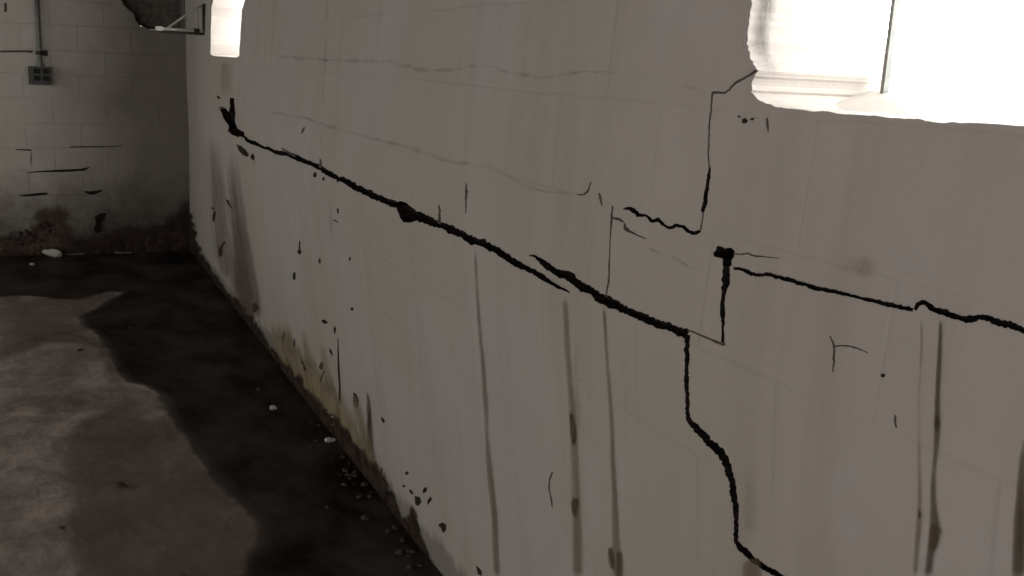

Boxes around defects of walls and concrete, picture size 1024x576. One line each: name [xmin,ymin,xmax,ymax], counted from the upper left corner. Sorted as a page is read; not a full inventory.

crack [15,145,123,197]
crack [229,69,1024,576]
damp [0,194,443,576]
damp [488,461,497,570]
damp [608,548,622,576]